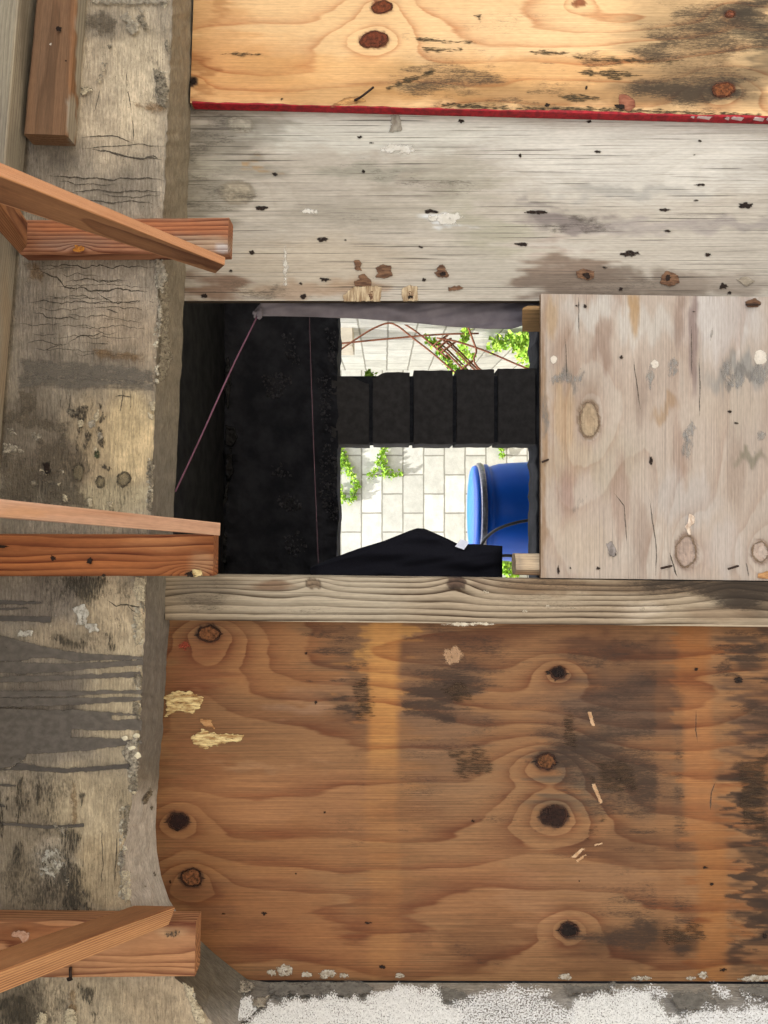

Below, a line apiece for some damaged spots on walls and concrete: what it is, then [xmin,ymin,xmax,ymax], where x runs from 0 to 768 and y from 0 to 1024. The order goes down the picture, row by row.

damp [417,37,470,53]
damp [529,50,679,80]
damp [386,70,435,89]
damp [441,93,762,118]
crack [54,74,164,204]
crack [21,264,152,356]
damp [62,576,110,601]
damp [0,633,143,911]
damp [449,746,493,778]
damp [268,981,374,998]
damp [432,987,474,1013]
damp [671,989,716,1012]